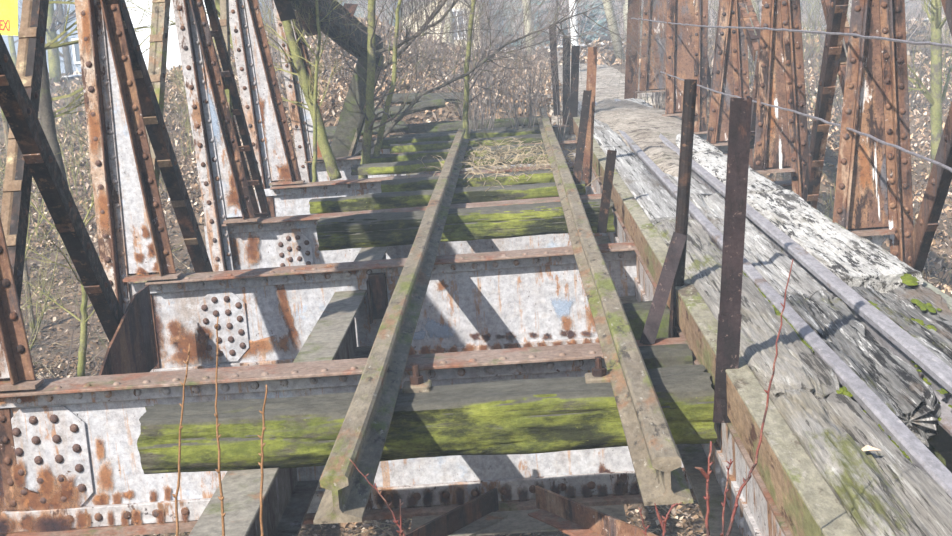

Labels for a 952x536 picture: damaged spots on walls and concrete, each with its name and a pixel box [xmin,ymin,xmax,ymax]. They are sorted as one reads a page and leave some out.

rust [857,141,874,195]
rust [153,299,213,366]
rust [242,284,300,358]
rust [409,312,600,355]
rust [0,396,38,405]
rust [0,439,142,534]
rust [149,486,171,524]
rust [376,488,481,509]
rust [502,464,640,502]